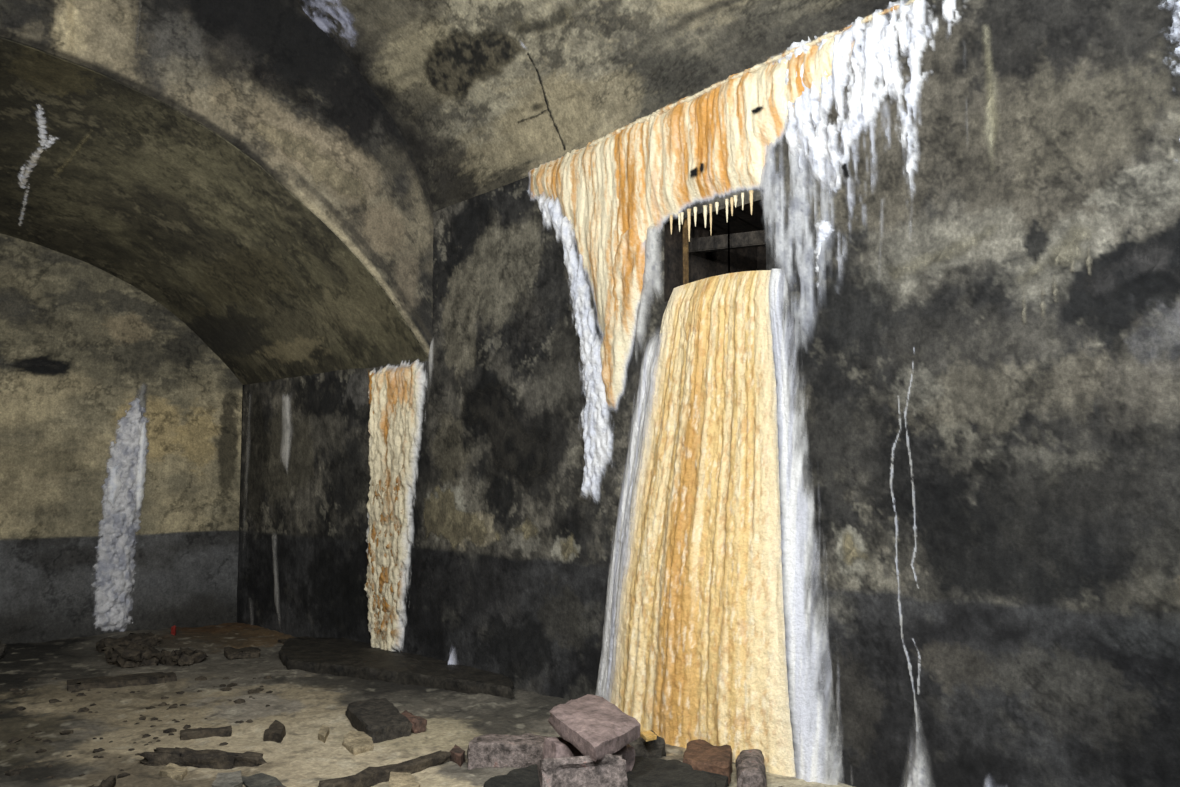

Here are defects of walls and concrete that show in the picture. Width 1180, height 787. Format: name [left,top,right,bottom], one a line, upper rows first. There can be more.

efflorescence [303,0,355,38]
water stain [1167,0,1180,72]
crack [518,53,565,150]
crack [18,106,58,226]
crack [890,399,926,787]